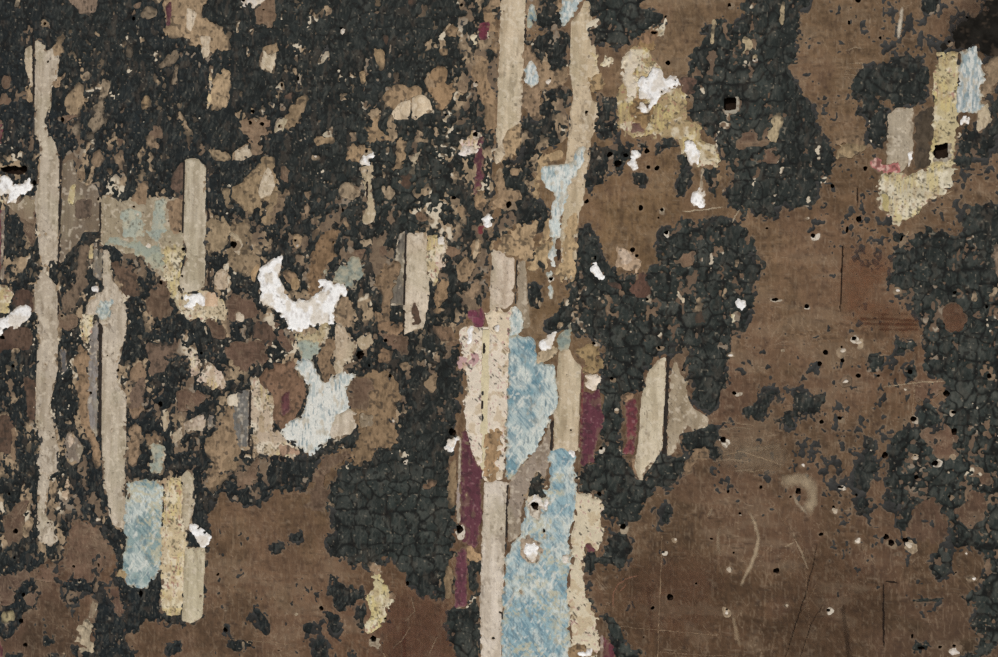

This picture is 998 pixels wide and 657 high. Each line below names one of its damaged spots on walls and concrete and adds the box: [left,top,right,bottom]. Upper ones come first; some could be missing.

peeling [62,71,110,139]
peeling [133,0,239,85]
peeling [207,68,232,111]
peeling [209,83,309,162]
peeling [415,0,554,309]
peeling [521,45,572,119]
peeling [552,0,601,30]
peeling [620,40,663,113]
spalling [933,143,948,159]
peeling [0,138,324,641]
peeling [585,374,614,391]
peeling [681,424,726,459]